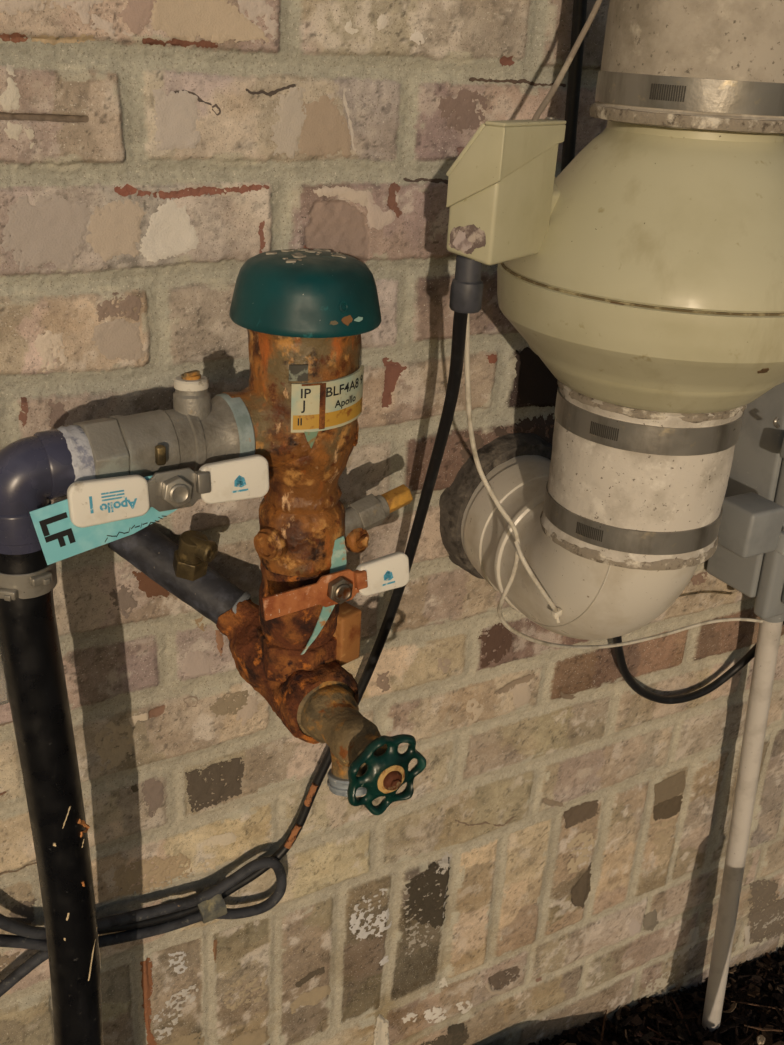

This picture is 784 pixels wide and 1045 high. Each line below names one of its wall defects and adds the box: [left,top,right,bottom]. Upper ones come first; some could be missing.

spalling [0,33,95,45]
spalling [142,38,218,48]
crack [246,84,296,96]
spalling [114,184,269,200]
spalling [258,221,266,254]
spalling [303,182,402,263]
damp [349,852,452,955]
rust [140,958,159,1045]